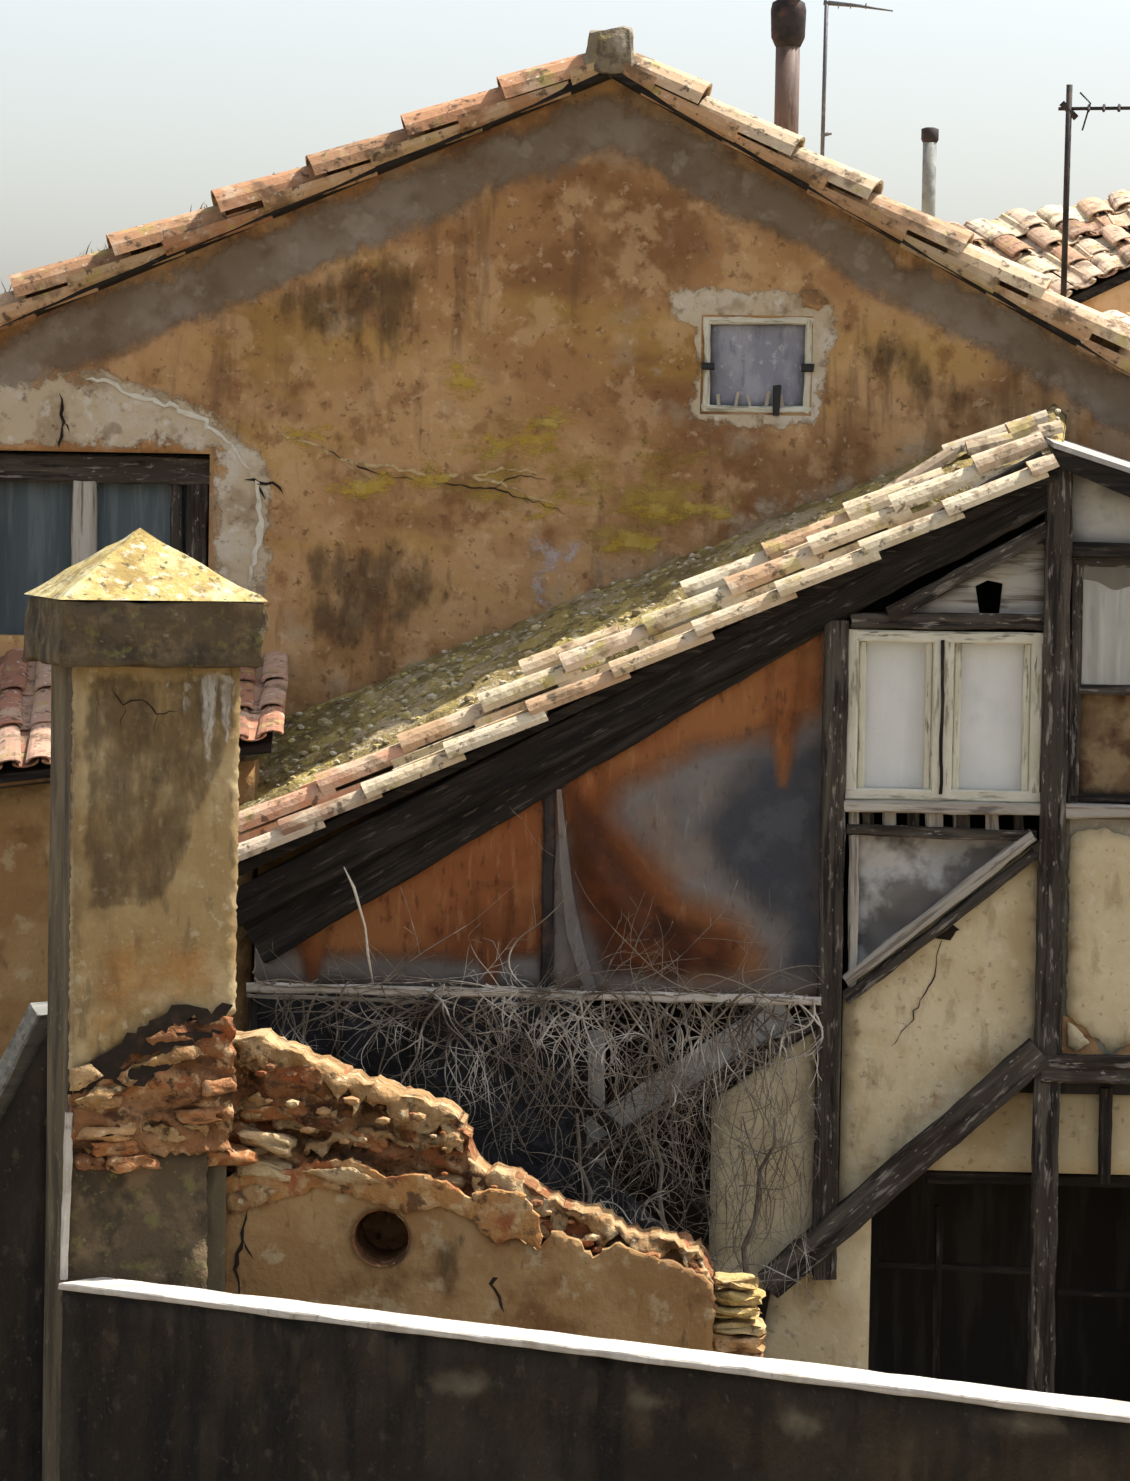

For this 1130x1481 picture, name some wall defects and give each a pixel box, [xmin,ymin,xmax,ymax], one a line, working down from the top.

peeling [669,286,839,429]
crack [245,478,283,500]
crack [276,434,564,514]
corrosion [560,633,824,974]
peeling [1070,819,1130,837]
corrosion [297,799,544,984]
crack [893,940,942,1045]
flaking render [1061,1016,1130,1055]
flaking render [68,1045,211,1114]
flaking render [143,1123,209,1142]
flaking render [226,1157,543,1252]